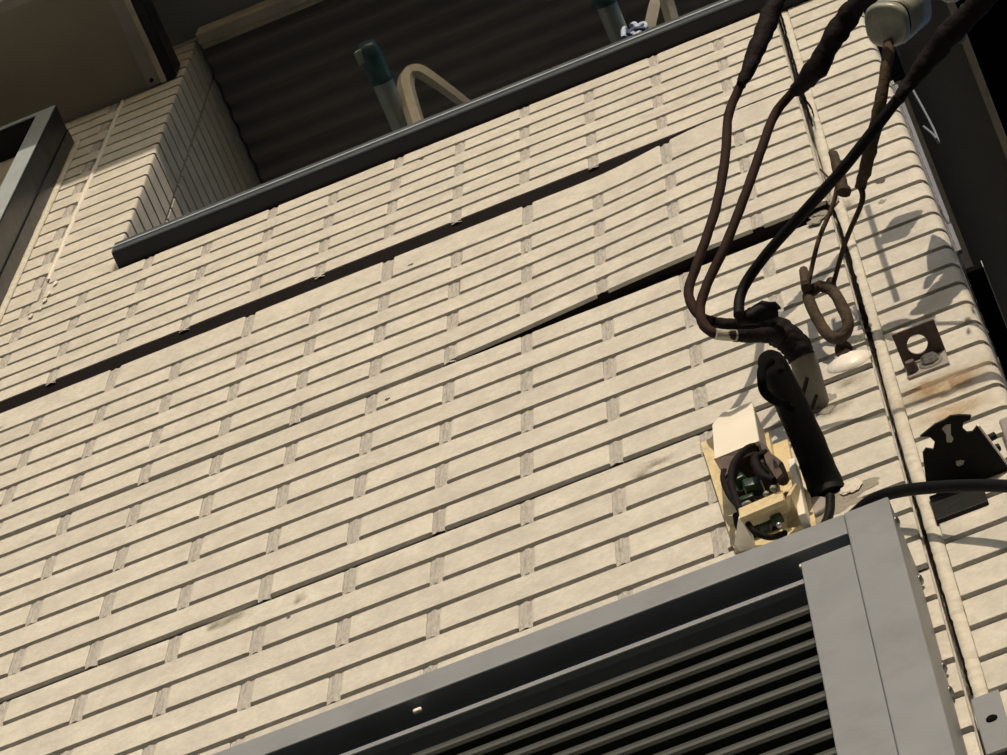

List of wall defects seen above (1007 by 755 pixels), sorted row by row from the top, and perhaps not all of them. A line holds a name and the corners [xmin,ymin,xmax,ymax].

corrosion [908,369,977,401]
corrosion [937,400,974,420]